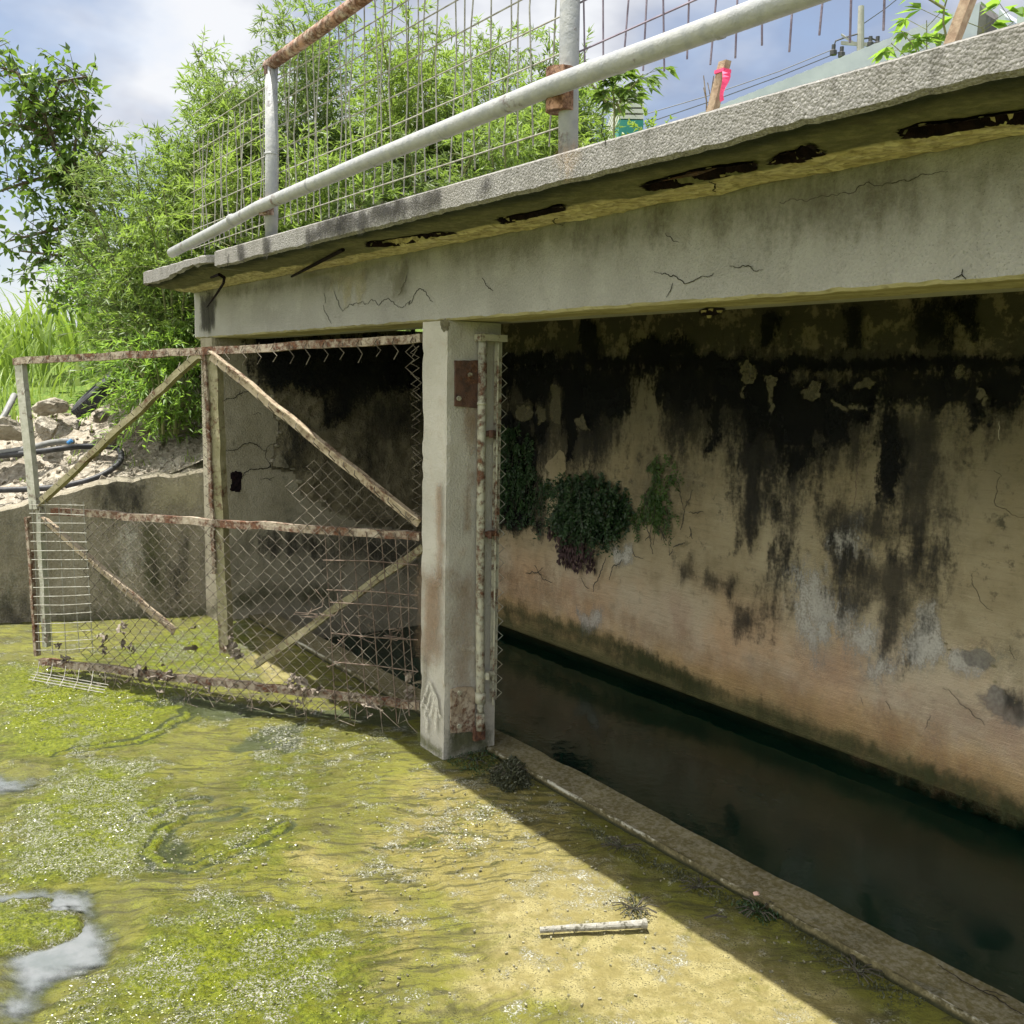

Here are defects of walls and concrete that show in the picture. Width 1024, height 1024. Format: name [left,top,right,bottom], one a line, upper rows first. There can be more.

spalling [896,109,1024,139]
spalling [639,145,826,191]
crack [779,171,948,204]
spalling [495,204,566,225]
crack [323,276,433,323]
crack [654,265,759,297]
crack [226,442,275,481]
leakage [499,294,1024,679]